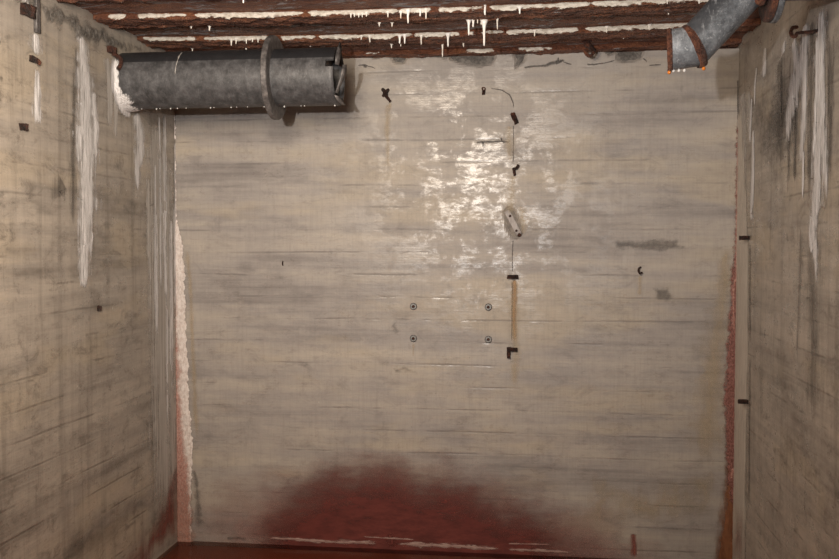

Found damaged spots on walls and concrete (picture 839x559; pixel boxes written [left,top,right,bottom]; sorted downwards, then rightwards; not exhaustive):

damp [281,32,459,40]
damp [138,0,709,19]
damp [470,23,687,35]
damp [779,12,828,279]
damp [76,36,193,546]
rust [716,128,738,559]
rust [237,470,611,559]